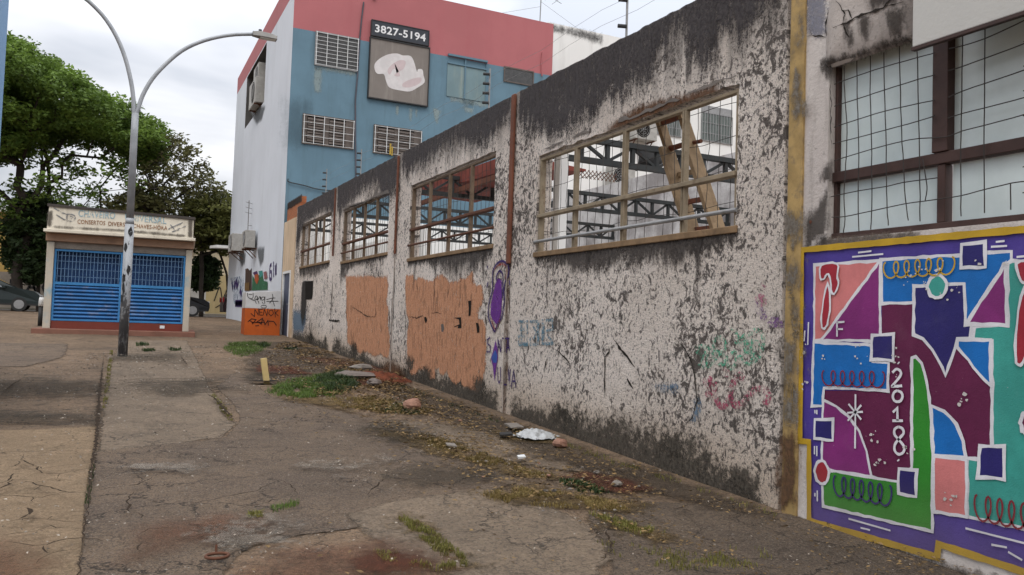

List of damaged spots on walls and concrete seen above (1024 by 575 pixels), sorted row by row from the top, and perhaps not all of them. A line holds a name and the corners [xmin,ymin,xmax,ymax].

leakage [287,0,776,252]
crack [809,0,901,37]
crack [0,357,298,575]
leakage [293,281,768,506]